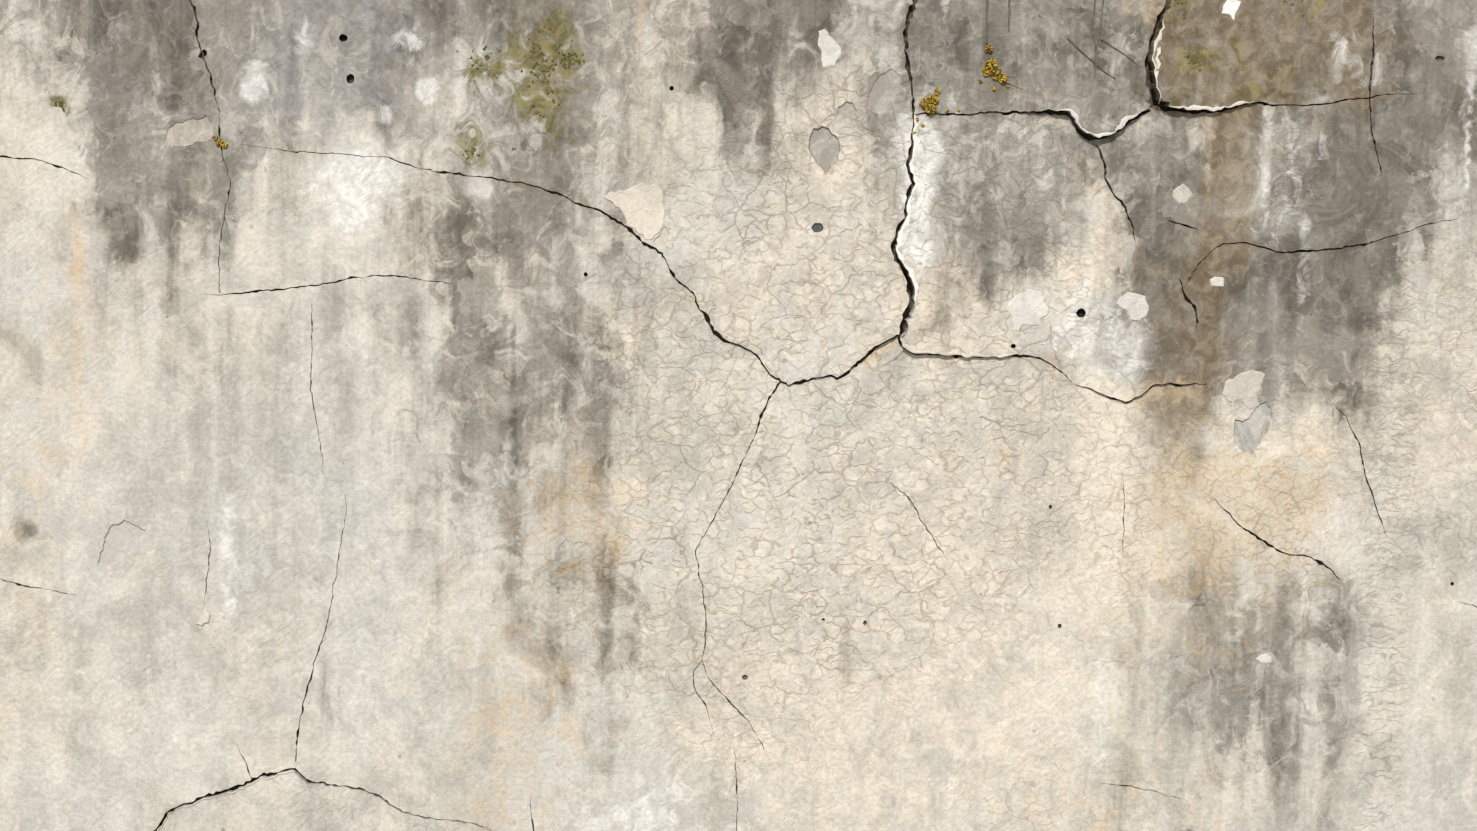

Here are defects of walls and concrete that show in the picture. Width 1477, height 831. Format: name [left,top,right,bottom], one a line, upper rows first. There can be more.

damp [6,0,913,831]
peeling [603,182,670,250]
crack [190,0,1407,749]
flaking render [808,0,1280,358]
damp [883,0,1477,831]
spalling [1222,370,1273,454]
crack [1168,219,1454,325]
crack [154,505,389,831]